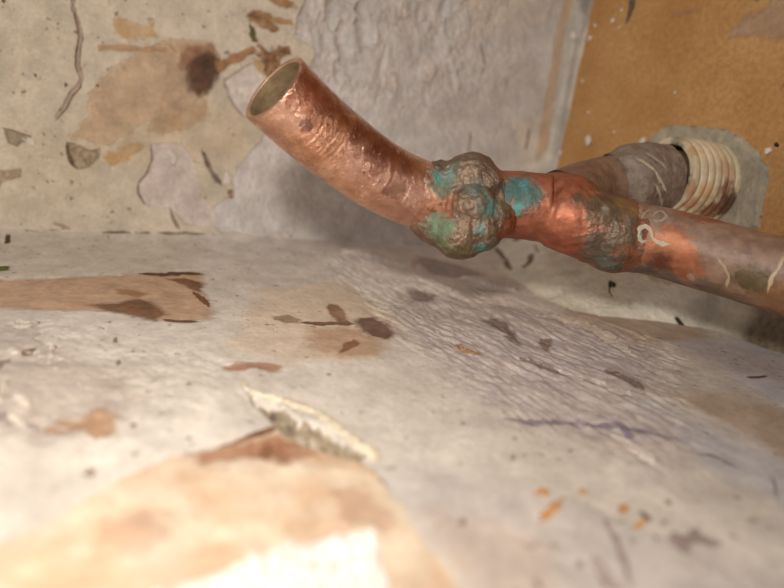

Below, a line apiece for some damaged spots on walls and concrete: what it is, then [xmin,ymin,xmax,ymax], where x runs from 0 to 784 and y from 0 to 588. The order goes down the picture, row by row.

crack [56,0,84,120]
spalling [294,0,561,173]
spalling [137,135,429,245]
spalling [215,381,384,463]